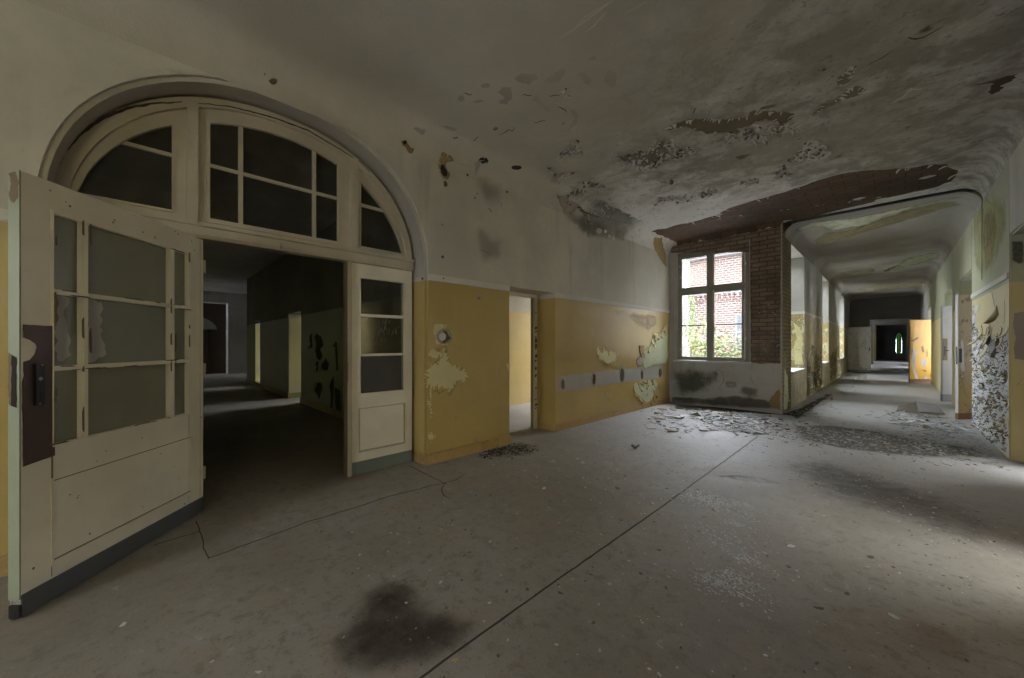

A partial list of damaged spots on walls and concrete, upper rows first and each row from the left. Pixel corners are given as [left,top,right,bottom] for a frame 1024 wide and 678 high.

peeling [613,65,865,180]
flaking render [438,152,454,187]
damp [575,203,635,241]
flaking render [650,164,958,410]
peeling [308,334,341,412]
peeling [424,324,469,419]
flaking render [558,324,681,407]
damp [672,370,979,456]
peeling [961,304,1024,457]